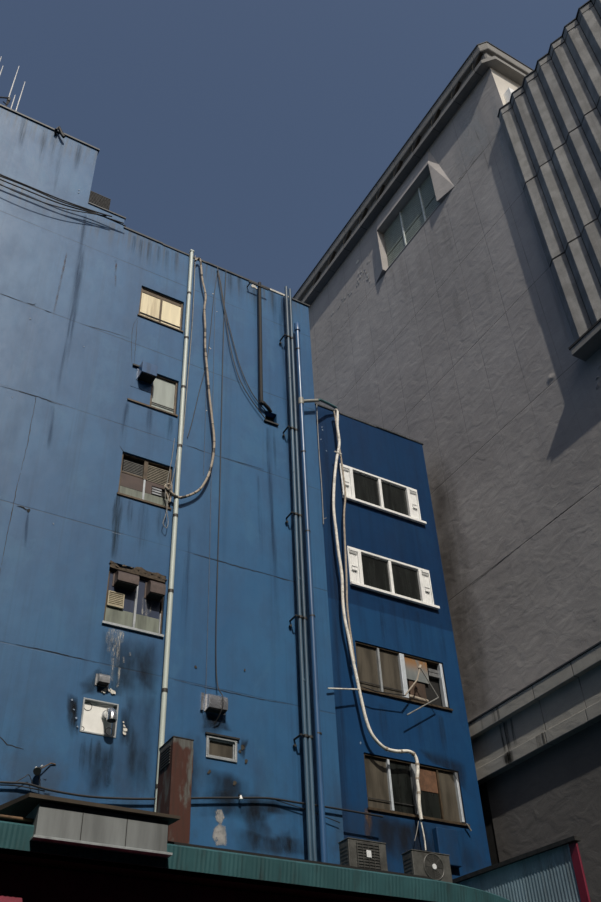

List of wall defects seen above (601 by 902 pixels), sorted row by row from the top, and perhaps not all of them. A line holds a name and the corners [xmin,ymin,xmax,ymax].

flaking render [213,810,226,845]